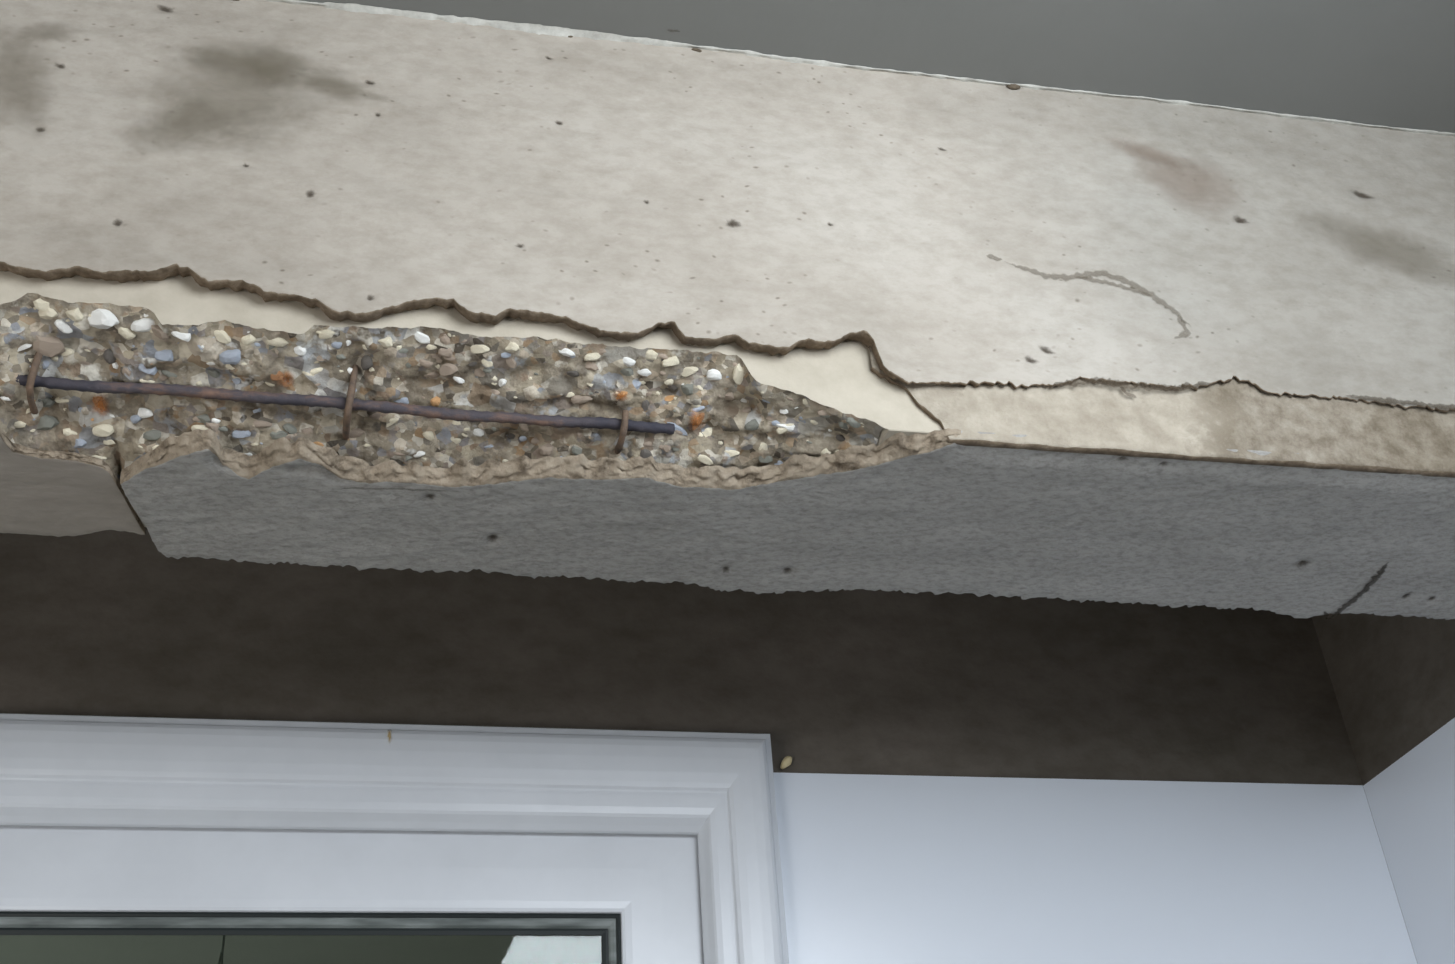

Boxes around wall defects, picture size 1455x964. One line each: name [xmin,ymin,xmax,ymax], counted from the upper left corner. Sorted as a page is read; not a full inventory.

spalling [0,293,883,481]
crack [1324,564,1387,619]